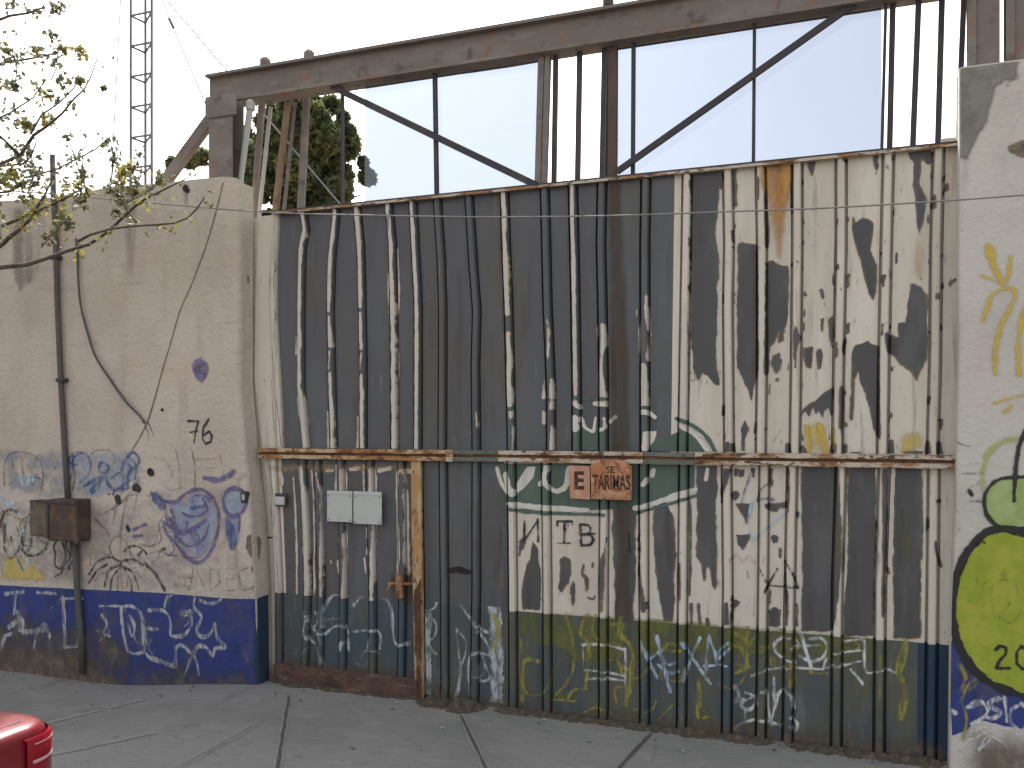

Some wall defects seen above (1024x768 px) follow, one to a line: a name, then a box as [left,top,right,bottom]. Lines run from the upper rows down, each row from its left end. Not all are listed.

peeling [327,208,338,448]
peeling [354,206,364,448]
peeling [385,201,419,449]
peeling [501,192,512,316]
peeling [506,331,516,450]
peeling [570,184,579,408]
corrosion [761,164,793,248]
peeling [677,161,956,454]
peeling [908,150,949,233]
peeling [959,61,1019,158]
corrosion [403,576,422,700]
peeling [558,465,943,639]